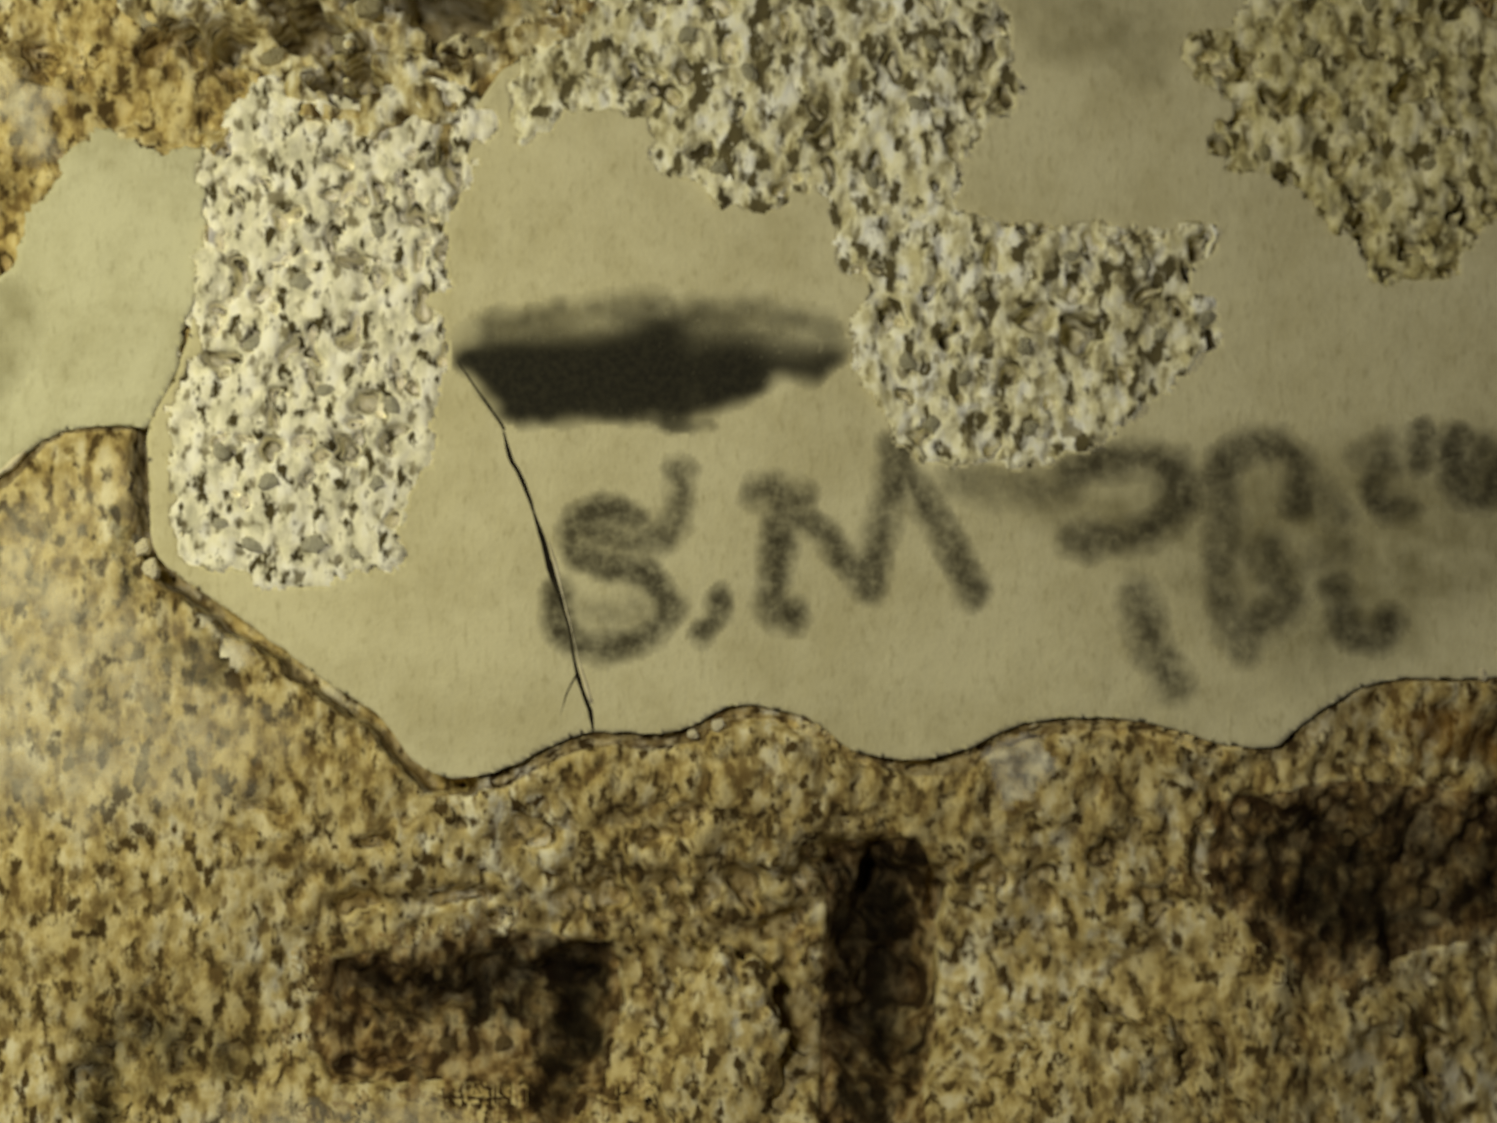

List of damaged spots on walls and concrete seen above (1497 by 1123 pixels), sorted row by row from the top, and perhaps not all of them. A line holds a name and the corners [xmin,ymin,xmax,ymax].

flaking render [0,0,1497,779]
crack [461,368,594,731]
spalling [279,899,657,1123]
spalling [783,809,939,1123]
spalling [1168,766,1497,1002]